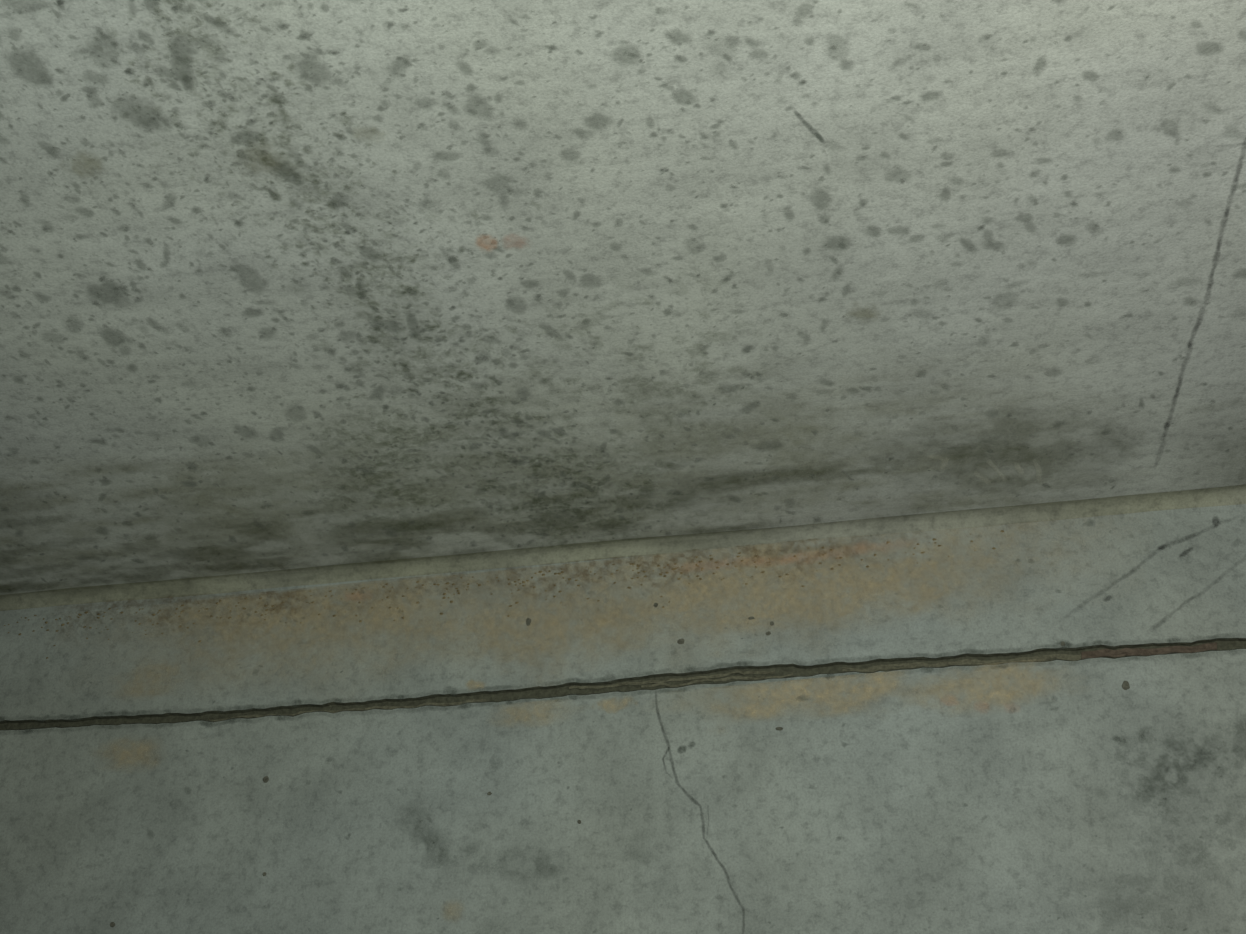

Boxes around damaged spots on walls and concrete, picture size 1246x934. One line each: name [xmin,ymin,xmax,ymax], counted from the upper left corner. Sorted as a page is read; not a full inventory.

crack [0,638,1246,730]